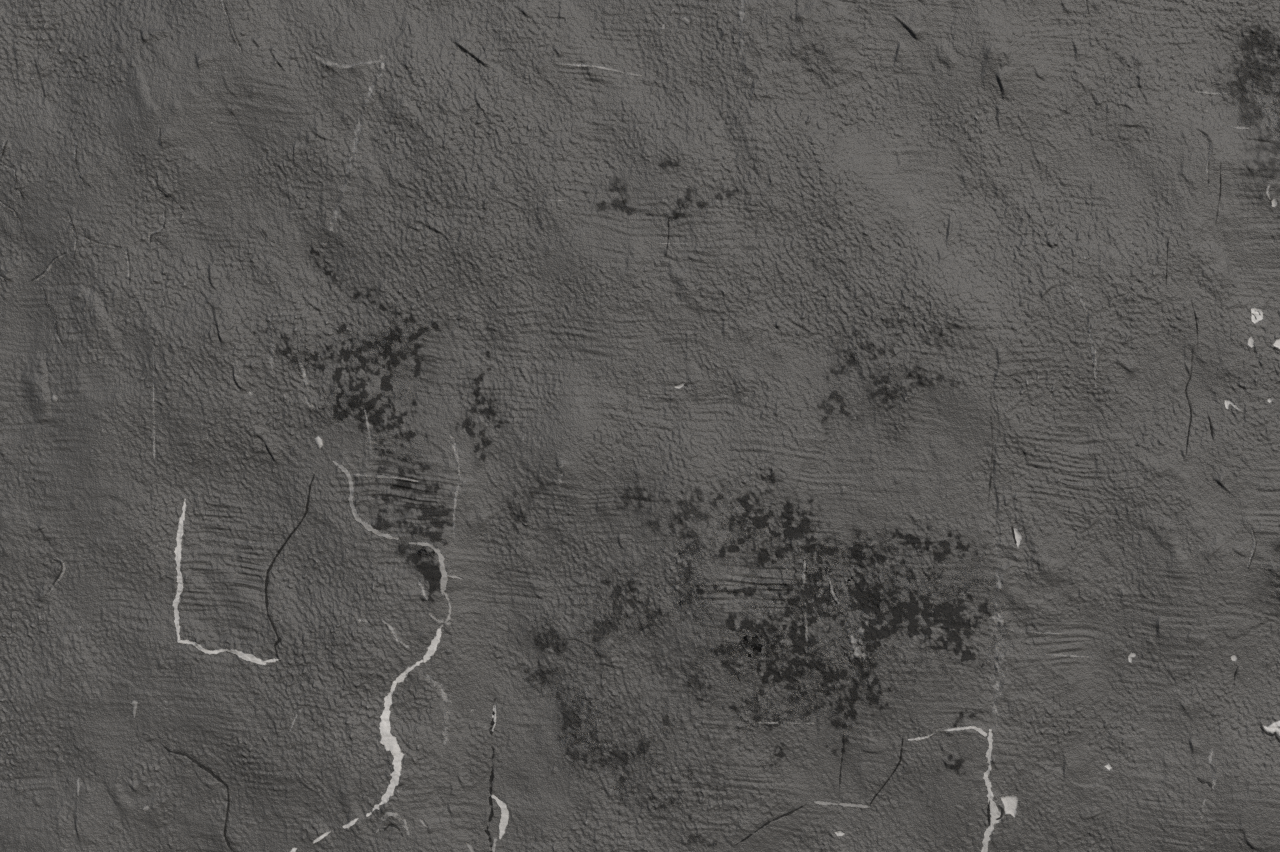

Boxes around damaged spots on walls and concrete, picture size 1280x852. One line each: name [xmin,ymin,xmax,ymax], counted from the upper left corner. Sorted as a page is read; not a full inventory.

peeling [1248,308,1263,347]
crack [265,474,315,657]
leakage [587,570,669,642]
leakage [618,471,1013,755]
leakage [524,624,650,814]
crack [737,736,903,844]
leakage [945,755,964,774]
peeling [1261,721,1280,742]